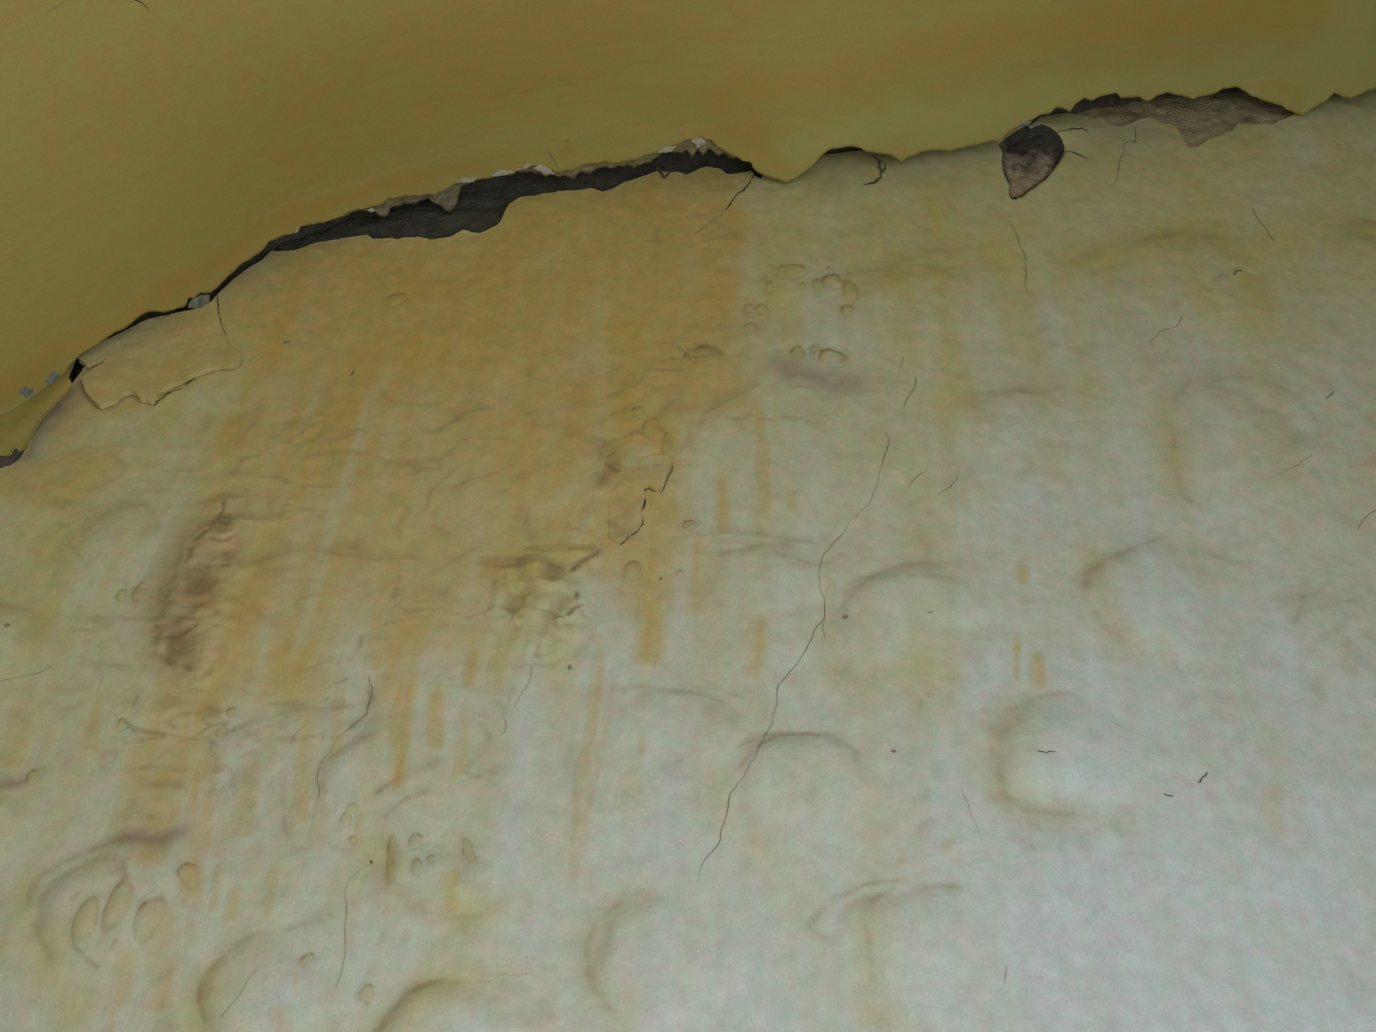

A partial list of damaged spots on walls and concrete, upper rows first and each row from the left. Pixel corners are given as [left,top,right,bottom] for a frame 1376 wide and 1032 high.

flaking render [999,124,1064,199]
flaking render [1078,92,1290,147]
flaking render [278,186,519,251]
peeling [0,369,73,468]
water stain [0,144,880,1032]
crack [699,355,957,877]